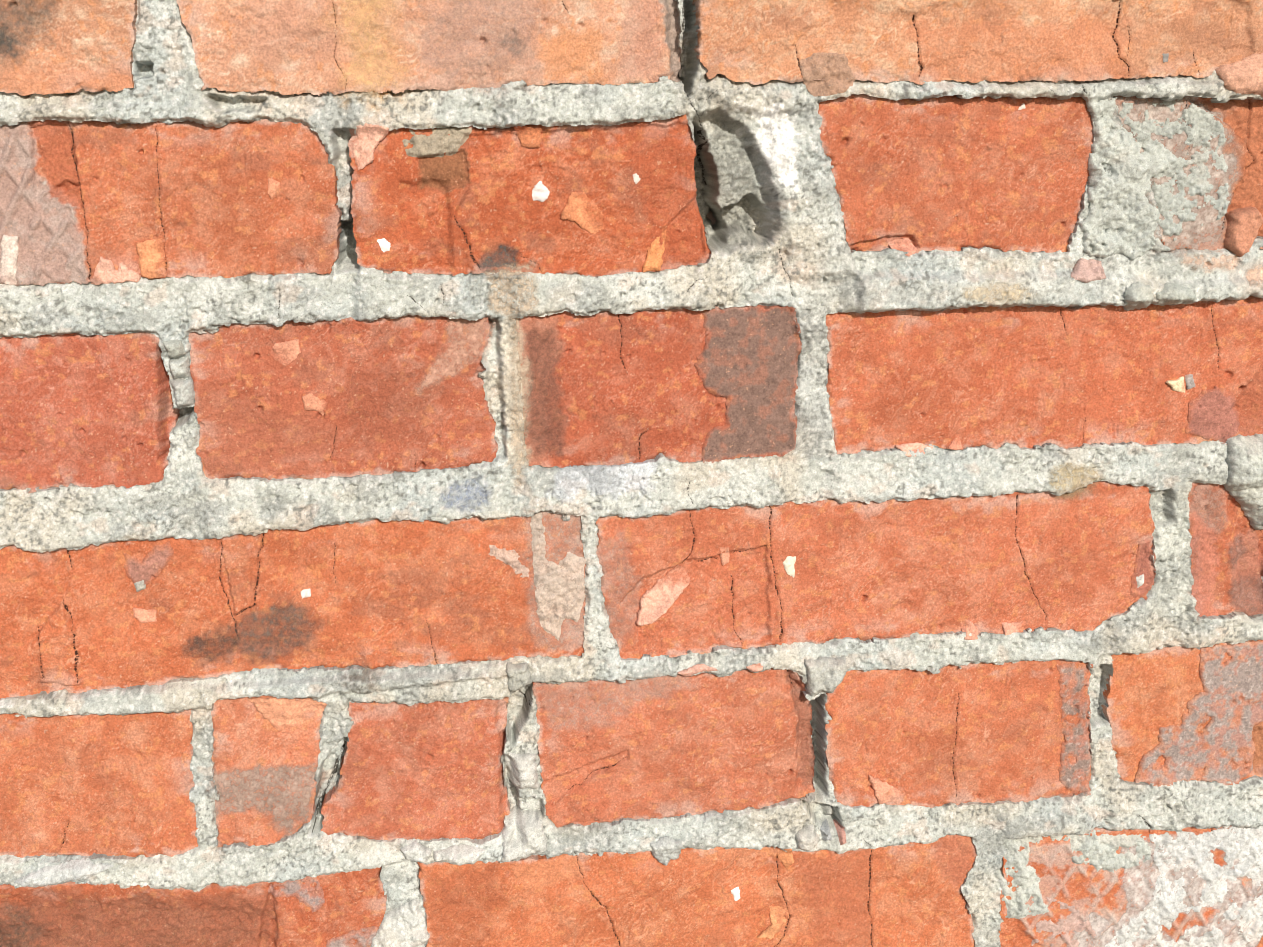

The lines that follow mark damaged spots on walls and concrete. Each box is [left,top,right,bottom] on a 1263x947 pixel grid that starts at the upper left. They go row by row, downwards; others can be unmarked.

crack [1112,1,1131,80]
spalling [1215,52,1263,249]
peeling [0,235,19,285]
crack [219,534,264,639]
crack [686,482,783,646]
crack [1015,492,1047,630]
spalling [1135,641,1263,787]
crack [574,852,620,946]
crack [774,856,790,947]
peeling [1075,826,1263,947]